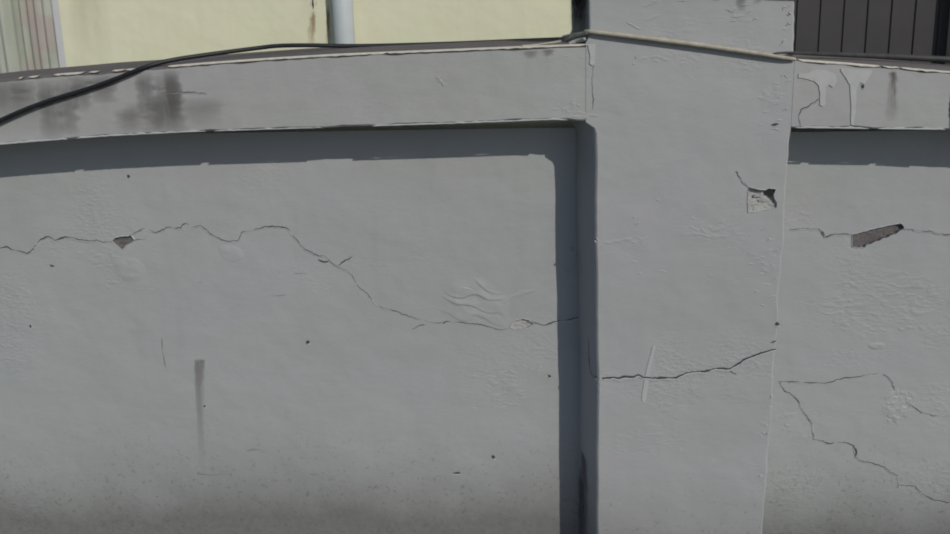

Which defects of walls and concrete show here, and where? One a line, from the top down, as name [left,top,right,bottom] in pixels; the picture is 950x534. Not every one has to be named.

spalling [747,187,777,213]
crack [0,236,111,255]
spalling [112,235,135,250]
crack [791,228,852,238]
spalling [851,223,905,248]
crack [903,228,950,236]
crack [133,223,578,331]
crack [588,341,776,382]
crack [778,373,950,504]